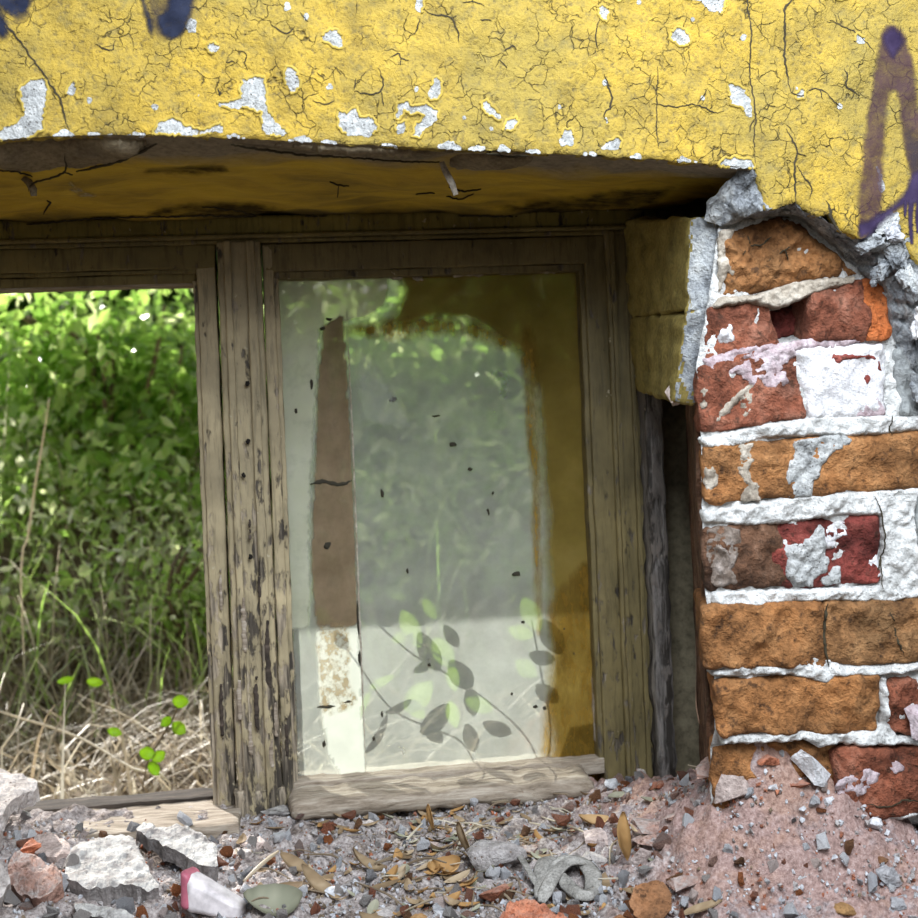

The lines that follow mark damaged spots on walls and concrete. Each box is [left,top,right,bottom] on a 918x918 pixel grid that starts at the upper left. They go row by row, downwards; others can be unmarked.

peeling [0,76,74,142]
crack [0,24,257,225]
peeling [127,104,245,139]
peeling [216,74,380,145]
crack [317,1,491,106]
peeling [393,75,444,140]
peeling [437,141,485,151]
crack [653,66,723,148]
crack [747,0,757,163]
crack [786,128,842,233]
crack [782,0,860,107]
flaking render [685,154,918,824]